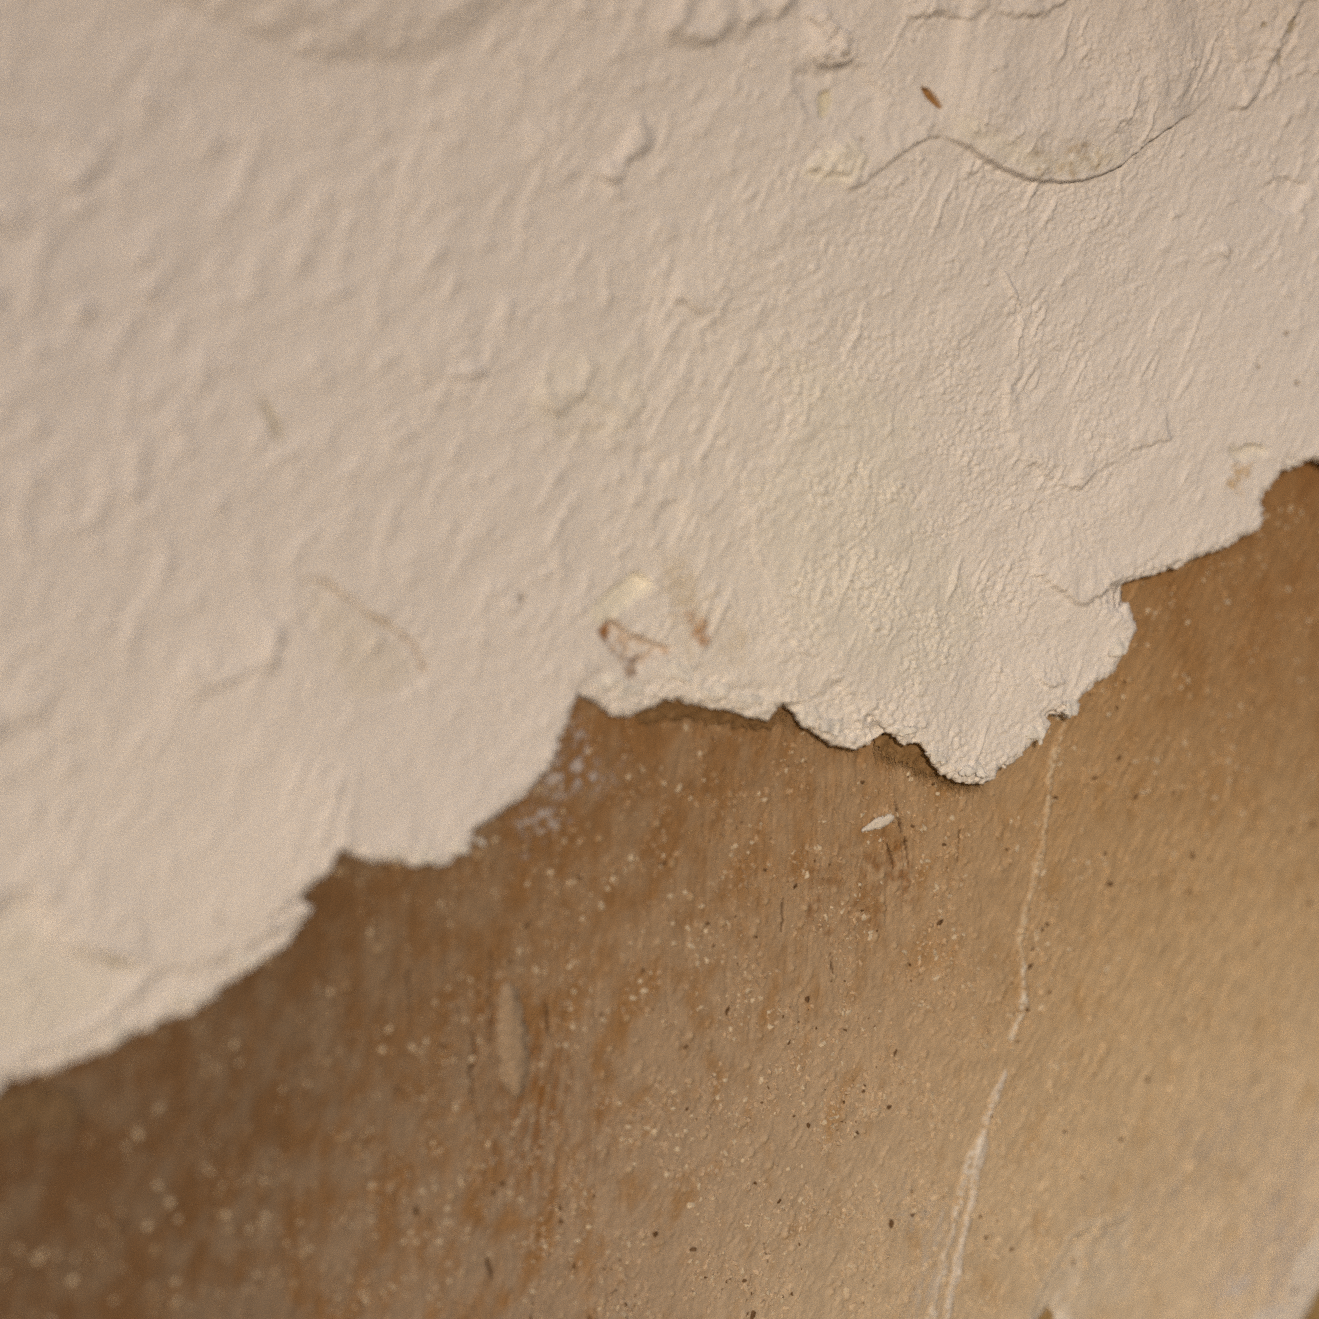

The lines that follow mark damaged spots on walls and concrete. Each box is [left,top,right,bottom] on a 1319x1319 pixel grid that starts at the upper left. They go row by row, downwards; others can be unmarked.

spalling [589,571,678,681]
peeling [1108,638,1130,656]
peeling [1063,698,1081,717]
peeling [796,705,844,737]
peeling [1025,723,1046,745]
peeling [924,749,948,765]
peeling [862,814,895,832]
peeling [386,838,470,868]
peeling [232,948,262,971]